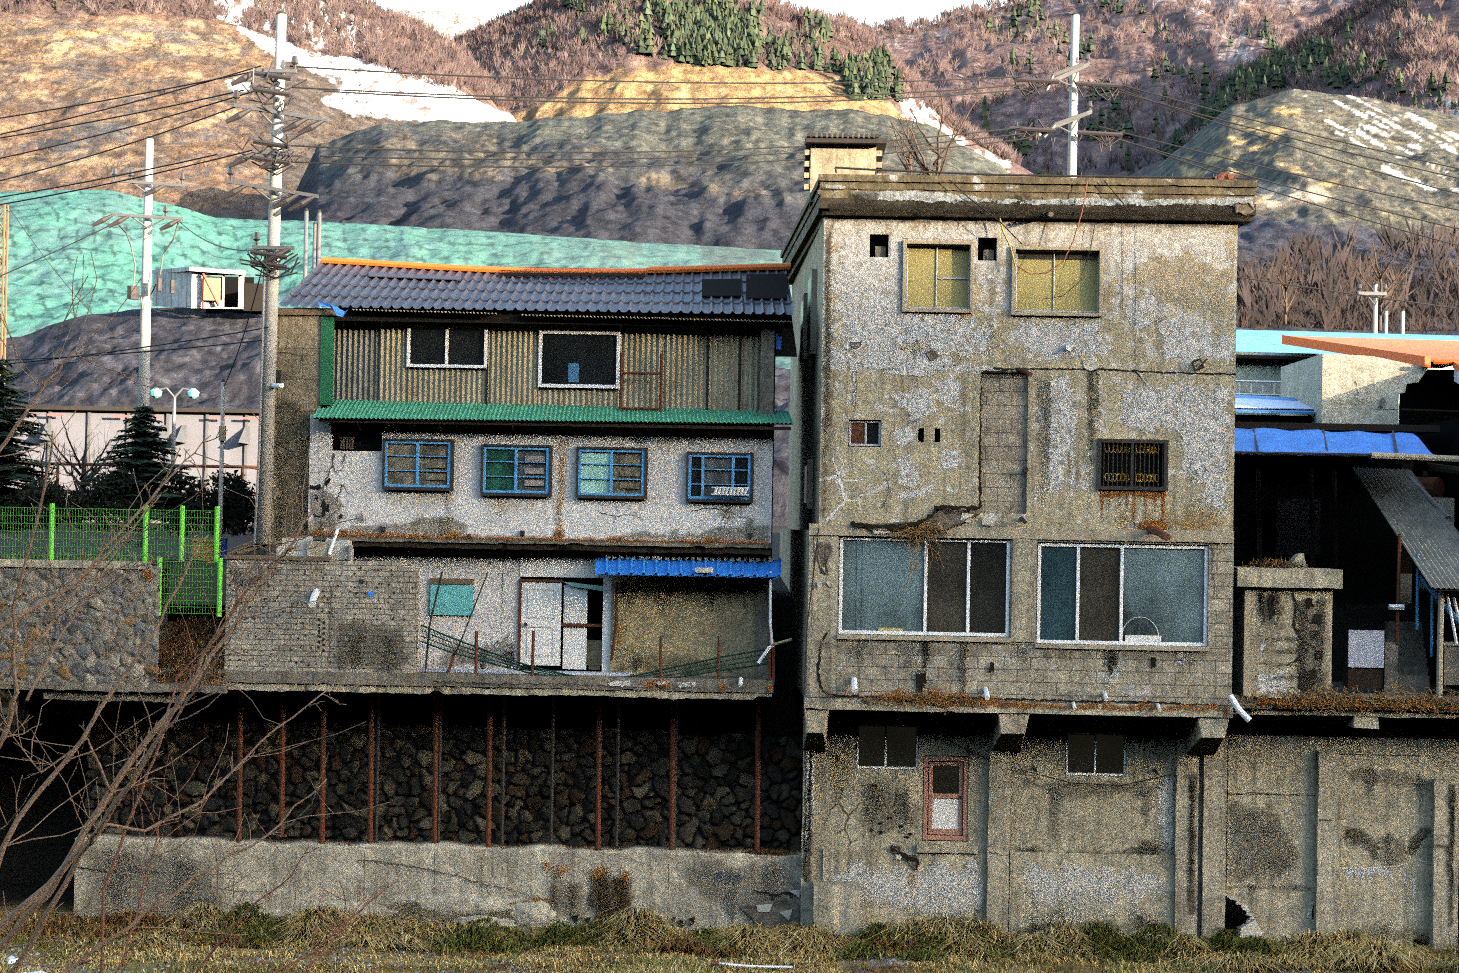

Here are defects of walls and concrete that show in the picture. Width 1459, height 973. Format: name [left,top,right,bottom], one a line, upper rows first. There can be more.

peeling [823,184,1255,534]
peeling [276,478,363,561]
crack [810,361,1459,712]
corrosion [1100,490,1217,543]
corrosion [589,866,629,882]
crack [826,785,919,871]
spalling [1225,892,1254,929]
leakage [1228,802,1308,904]
leakage [1345,828,1430,911]
leakage [1447,784,1456,926]